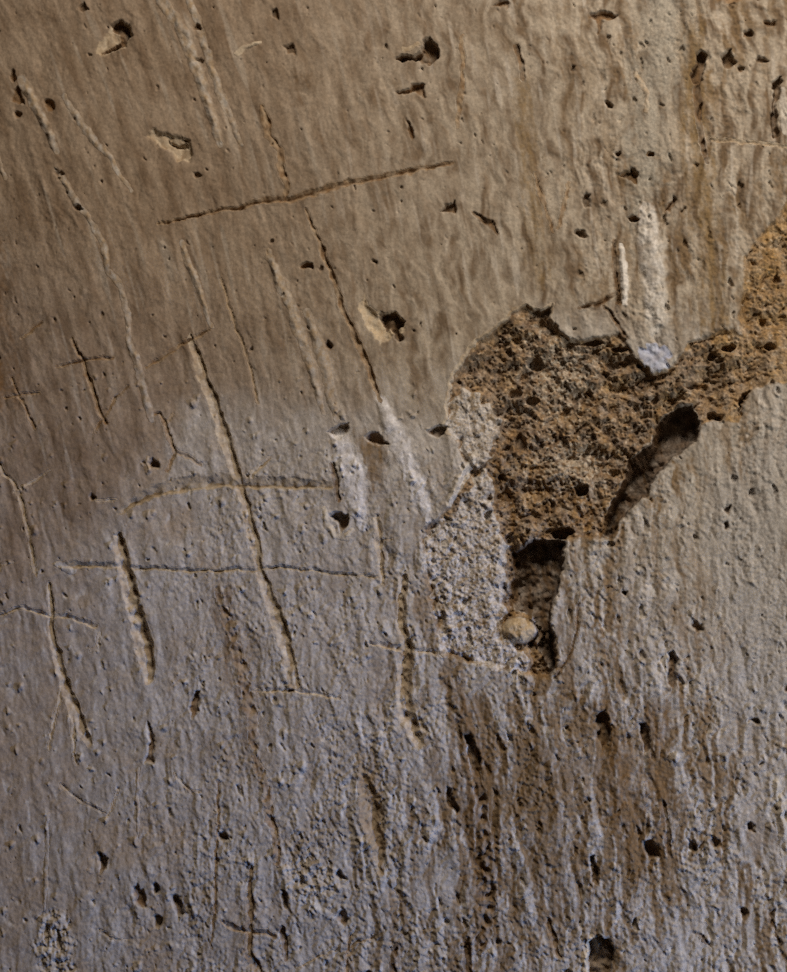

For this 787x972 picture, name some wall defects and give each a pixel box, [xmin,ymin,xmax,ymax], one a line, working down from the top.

spalling [419,196,787,681]
spalling [666,651,679,692]